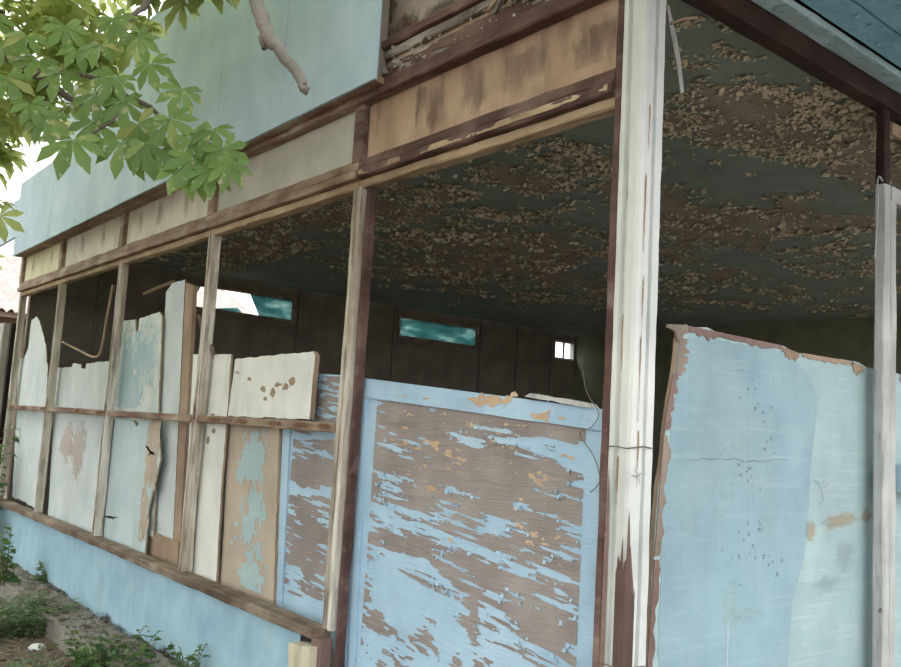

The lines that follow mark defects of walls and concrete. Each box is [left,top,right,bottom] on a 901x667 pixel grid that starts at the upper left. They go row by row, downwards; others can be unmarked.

peeling [219,198,353,281]
peeling [371,130,613,316]
peeling [420,95,579,154]
peeling [657,15,876,325]
peeling [772,5,901,87]
peeling [889,135,901,190]
peeling [260,377,295,401]
peeling [230,427,268,594]
peeling [284,376,340,601]
peeling [360,387,589,667]
peeling [599,473,635,667]
spalling [647,326,864,667]